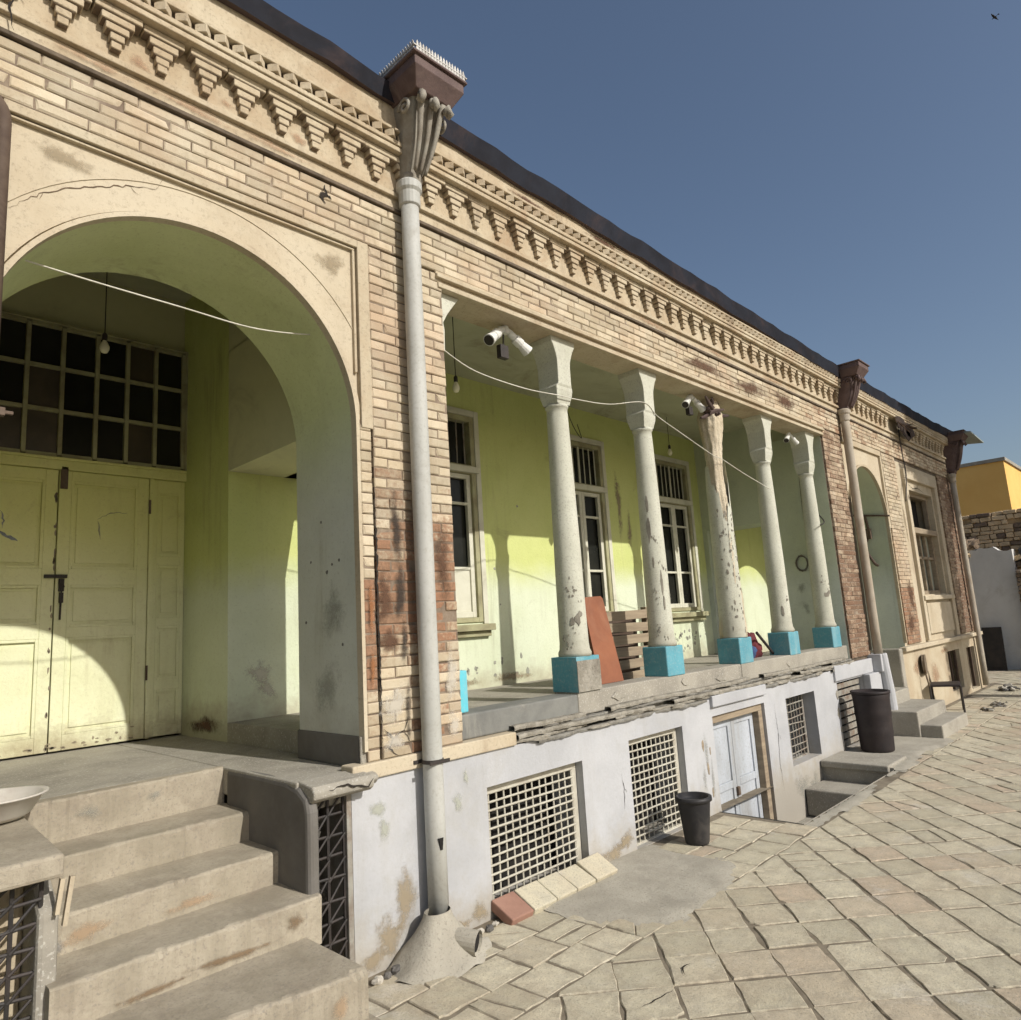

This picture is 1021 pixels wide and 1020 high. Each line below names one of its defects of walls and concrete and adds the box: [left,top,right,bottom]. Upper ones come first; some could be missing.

crack [9,181,162,208]
damp [393,507,401,550]
damp [379,569,405,618]
damp [435,535,449,590]
peeling [716,509,746,632]
damp [381,629,408,658]
damp [367,875,415,970]